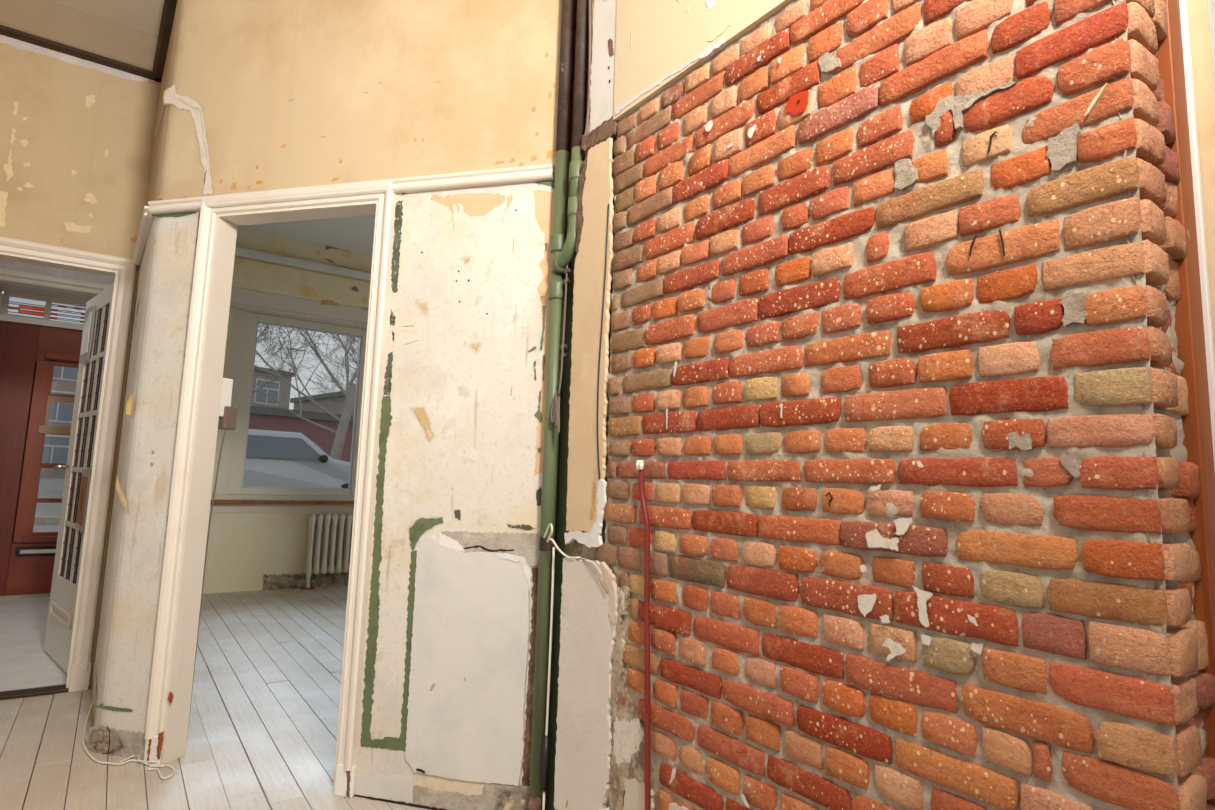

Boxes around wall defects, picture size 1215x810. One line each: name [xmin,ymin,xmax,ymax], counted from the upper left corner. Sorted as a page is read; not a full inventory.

peeling [0,101,34,227]
crack [155,84,213,195]
peeling [59,193,97,243]
peeling [430,193,513,231]
peeling [87,725,164,761]